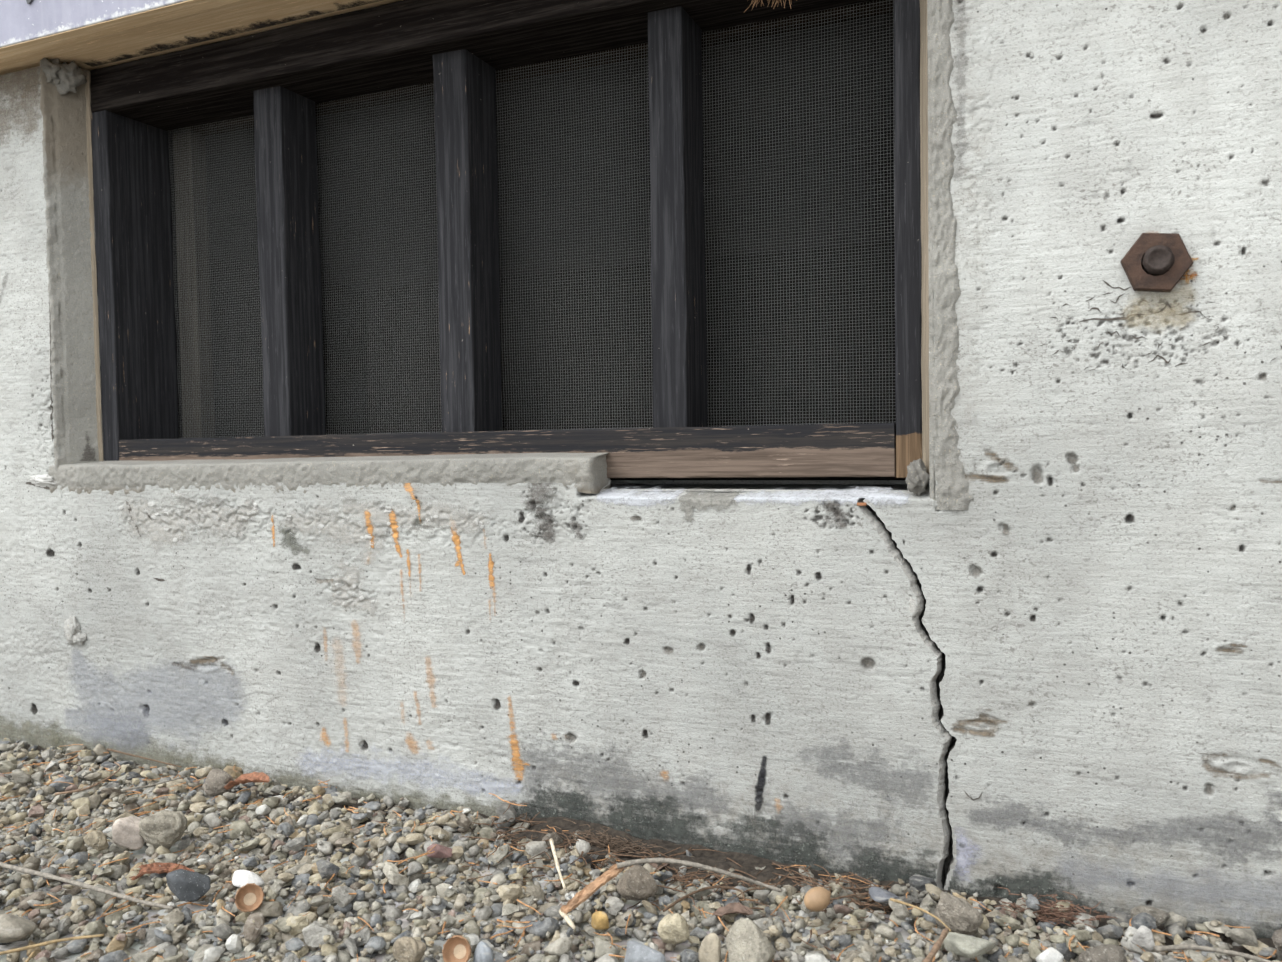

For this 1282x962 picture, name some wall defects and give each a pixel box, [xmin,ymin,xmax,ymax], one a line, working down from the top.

corrosion [405,483,421,521]
corrosion [365,511,374,548]
corrosion [389,511,421,593]
corrosion [451,522,465,575]
crack [854,499,982,890]
water stain [755,756,767,810]
water stain [1204,754,1278,779]
water stain [971,802,1282,863]